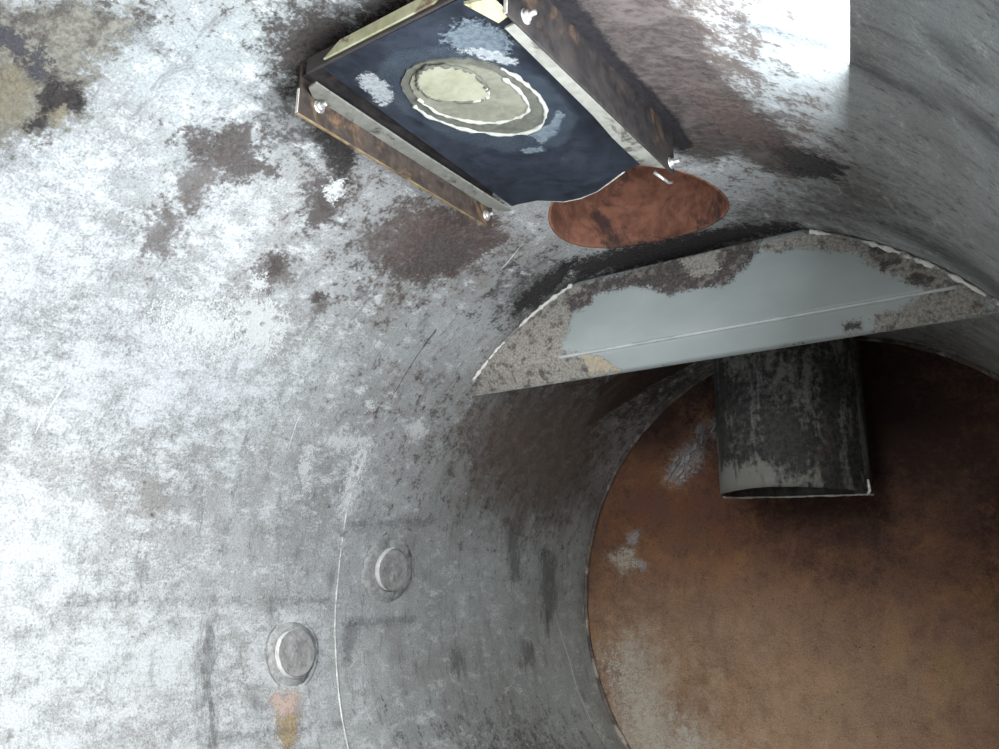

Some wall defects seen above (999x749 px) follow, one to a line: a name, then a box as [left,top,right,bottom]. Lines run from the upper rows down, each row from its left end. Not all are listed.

peeling [563,290,593,314]
peeling [580,354,621,374]
corrosion [594,362,693,421]
corrosion [270,687,301,749]